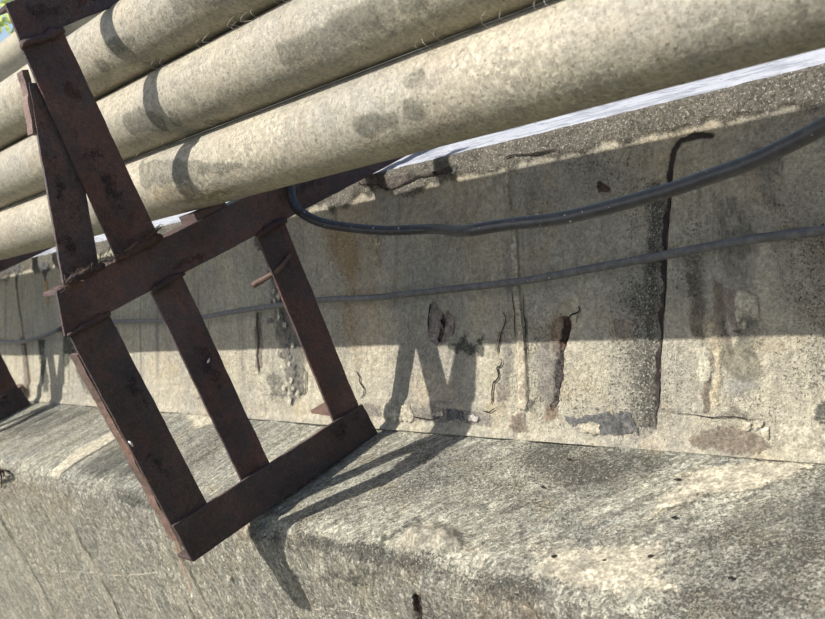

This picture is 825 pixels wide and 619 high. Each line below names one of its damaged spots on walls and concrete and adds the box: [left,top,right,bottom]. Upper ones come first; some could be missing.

spalling [427,301,454,346]
crack [491,294,526,403]
peeling [535,306,639,436]
crack [655,132,753,429]